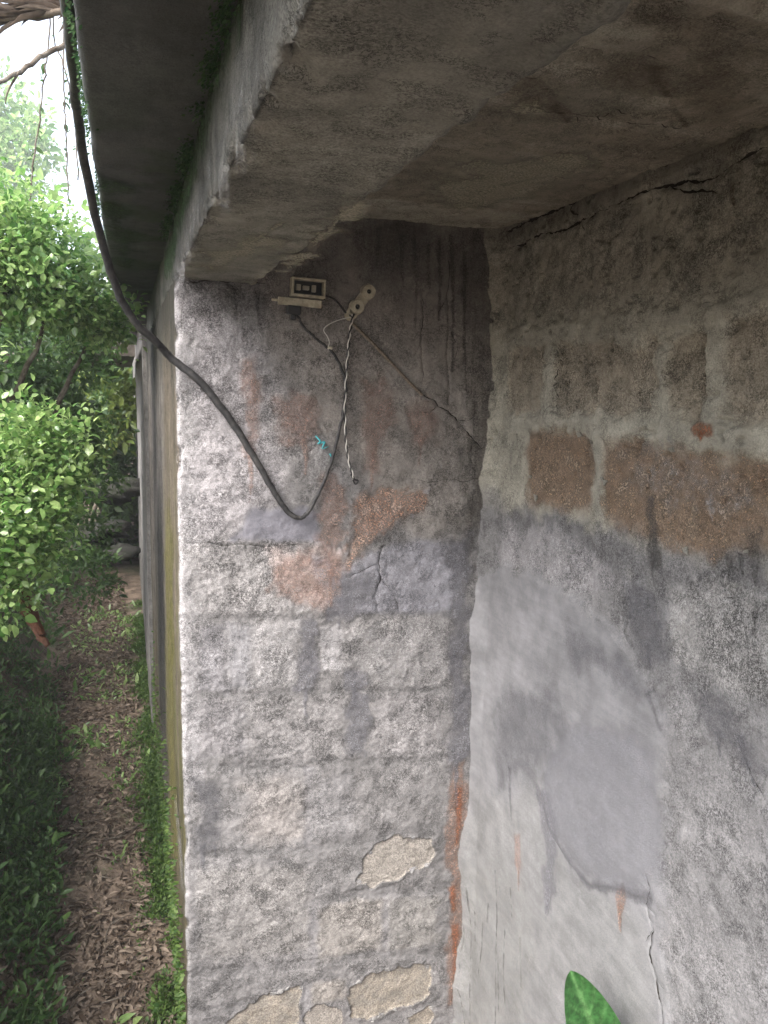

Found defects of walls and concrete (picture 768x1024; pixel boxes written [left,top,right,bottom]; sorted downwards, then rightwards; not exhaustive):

crack [507,147,767,247]
crack [416,251,483,495]
crack [351,547,399,611]
flaking render [356,834,435,888]
rust [445,762,468,1006]
leakage [537,786,556,910]
flaking render [226,964,434,1024]